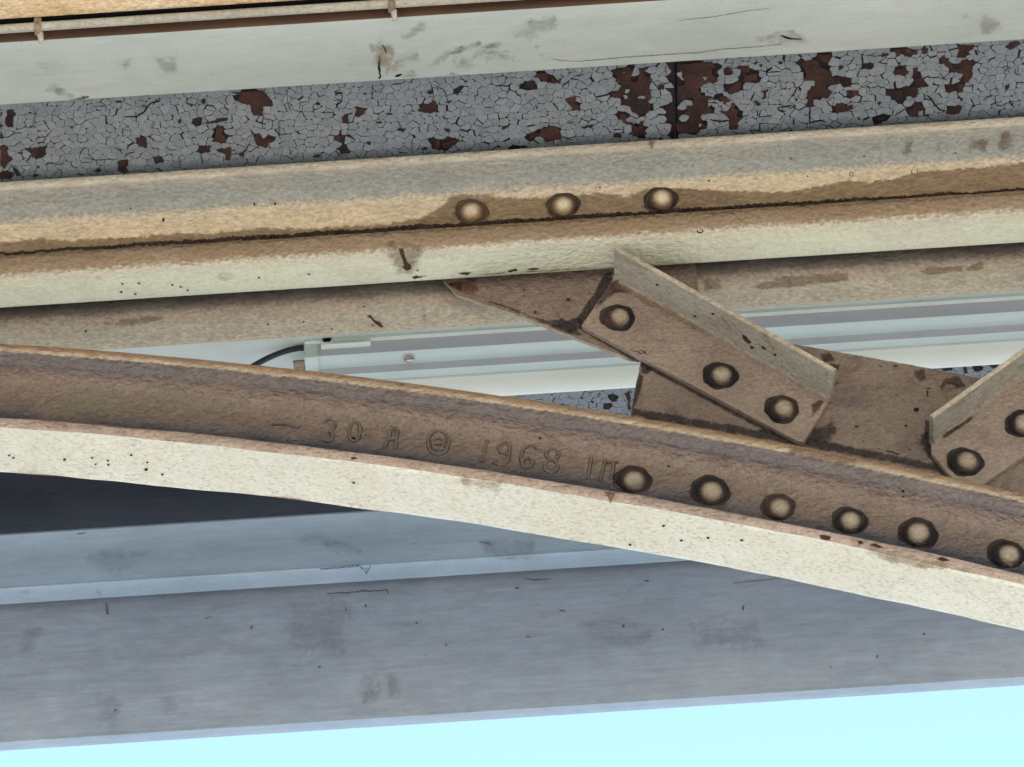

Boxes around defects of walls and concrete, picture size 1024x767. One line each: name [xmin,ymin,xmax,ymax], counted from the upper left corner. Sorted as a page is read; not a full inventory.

peeling [0,112,47,178]
peeling [198,118,245,160]
peeling [230,90,271,116]
peeling [333,109,371,154]
peeling [418,90,463,114]
peeling [524,73,561,95]
peeling [529,106,562,143]
peeling [611,66,664,138]
peeling [669,62,769,133]
peeling [795,54,859,113]
peeling [877,48,929,121]
peeling [941,45,978,115]